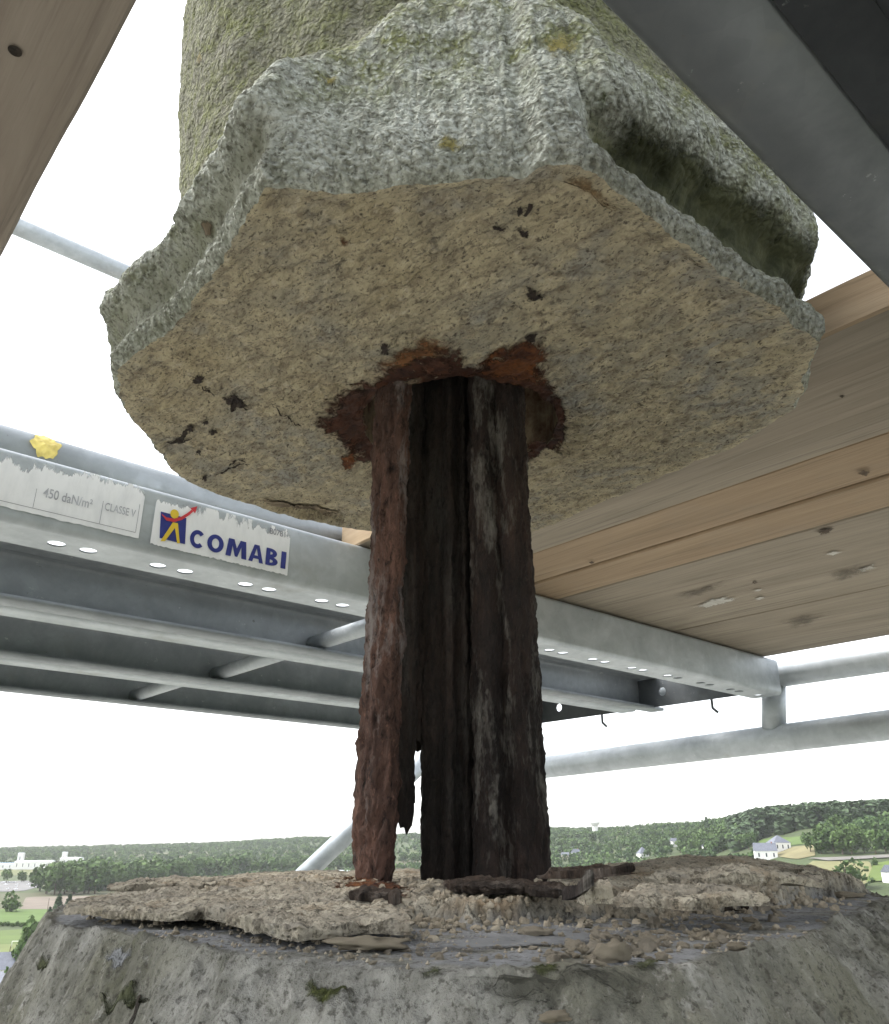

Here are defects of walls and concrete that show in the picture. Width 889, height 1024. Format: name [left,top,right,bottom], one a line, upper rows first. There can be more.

rust [313,339,567,470]
spalling [576,879,614,906]